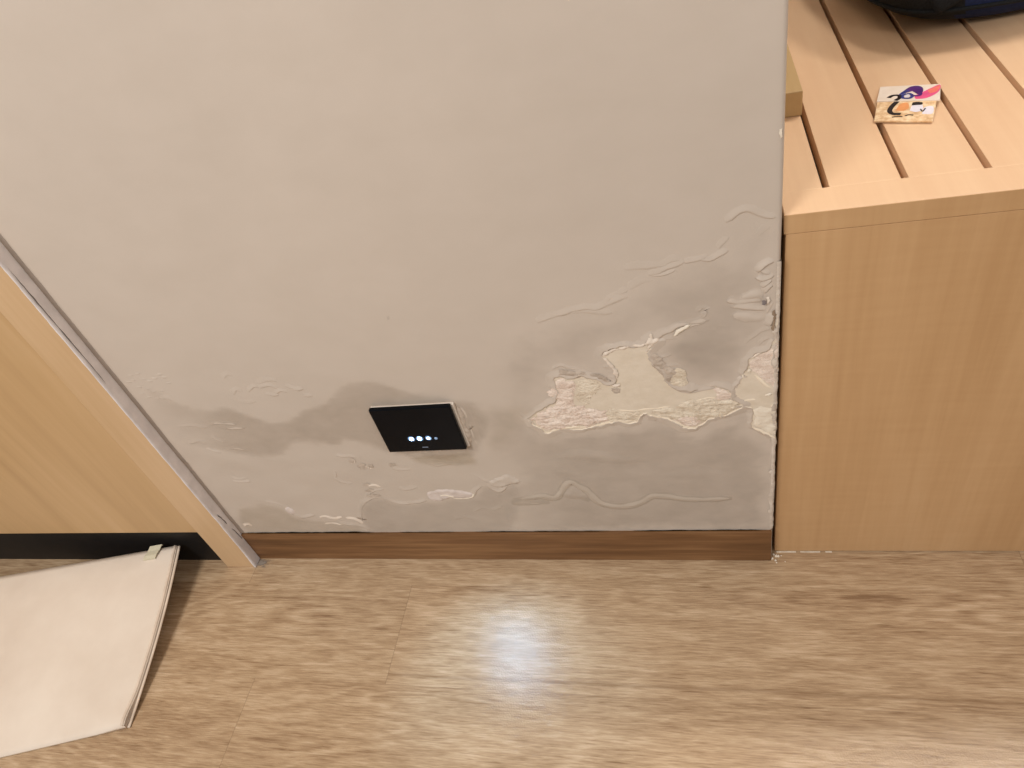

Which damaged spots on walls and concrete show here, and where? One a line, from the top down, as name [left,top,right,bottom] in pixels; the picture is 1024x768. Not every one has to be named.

peeling [519,259,782,529]